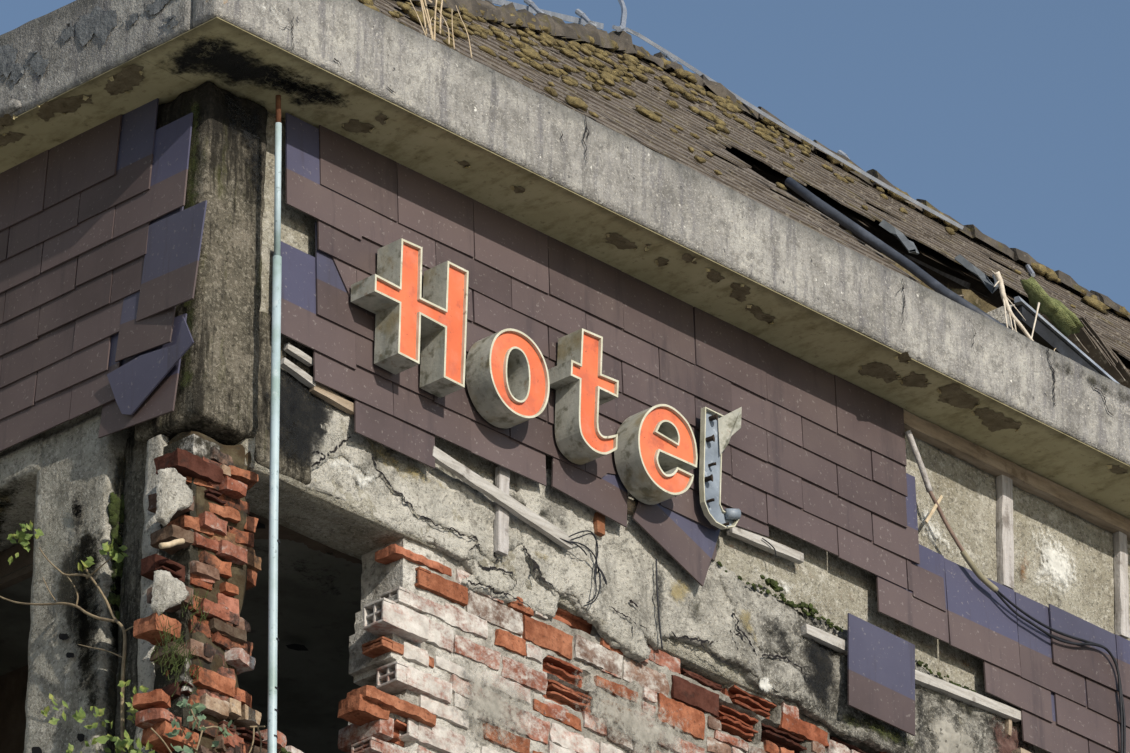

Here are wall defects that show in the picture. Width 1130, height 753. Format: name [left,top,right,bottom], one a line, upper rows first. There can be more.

spalling [61,0,179,46]
damp [161,38,344,202]
crack [1047,347,1056,406]
damp [265,371,333,467]
crack [311,436,351,467]
peeling [156,468,193,526]
crack [372,454,555,609]
peeling [150,570,189,616]
crack [612,599,804,675]